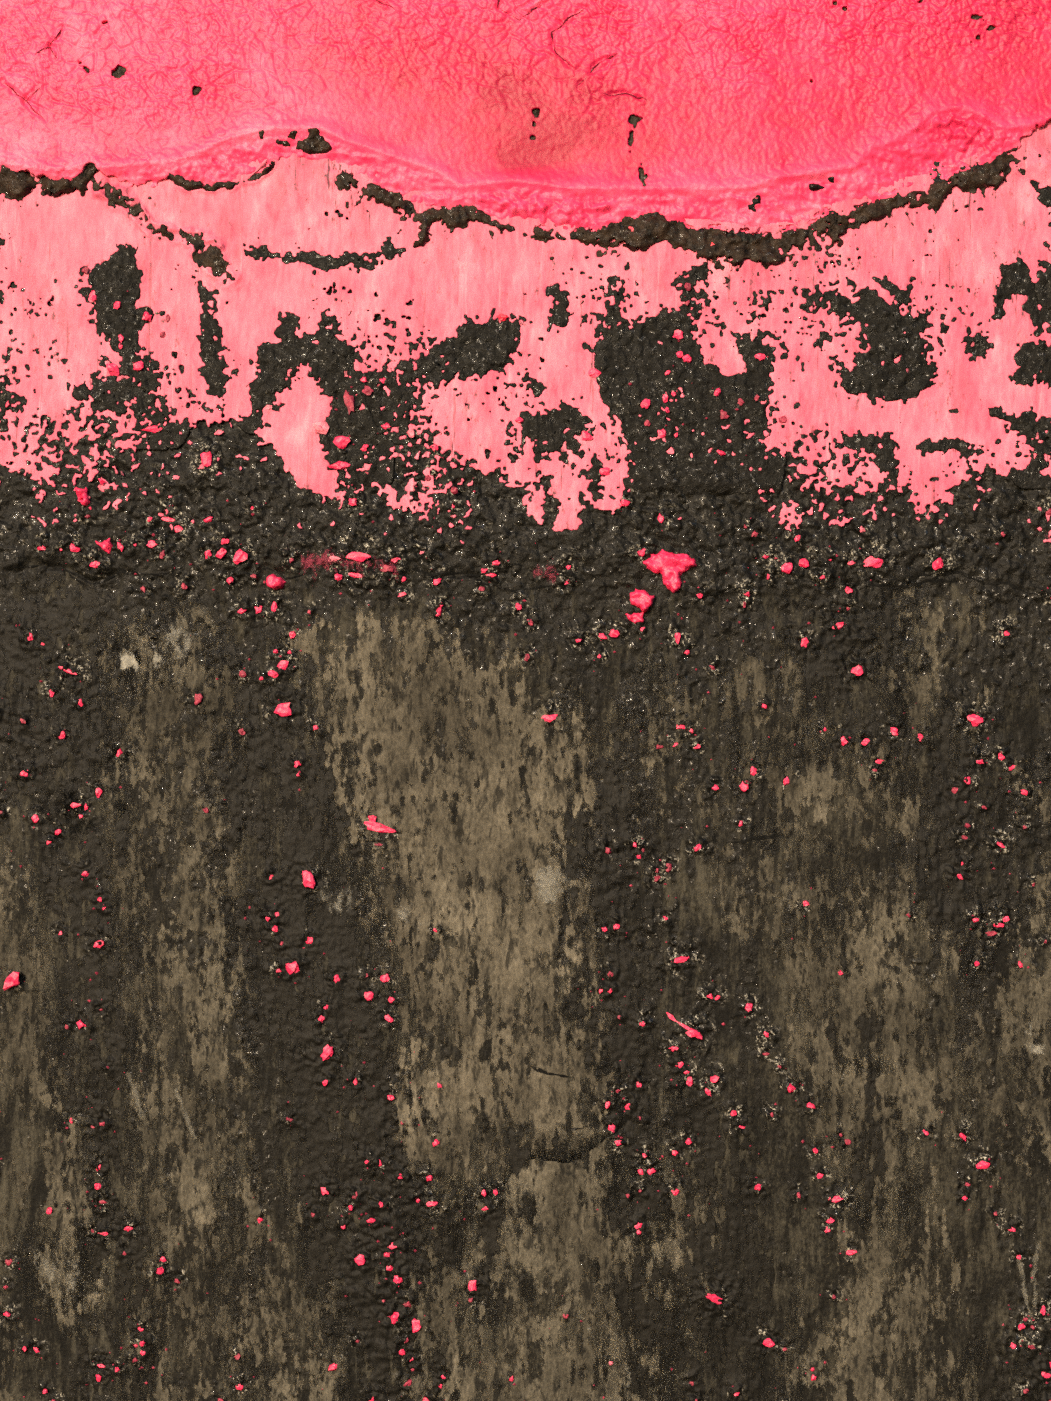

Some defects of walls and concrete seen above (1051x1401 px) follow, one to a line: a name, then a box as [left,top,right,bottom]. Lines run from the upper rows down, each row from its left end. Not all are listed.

peeling [0,0,1051,544]
peeling [37,538,165,568]
peeling [205,539,286,614]
peeling [478,560,500,591]
peeling [763,555,883,579]
leakage [120,628,190,672]
leakage [536,867,561,901]
leakage [127,1072,144,1119]
leakage [455,1186,534,1318]
leakage [599,1074,792,1401]
leakage [1031,1241,1040,1307]